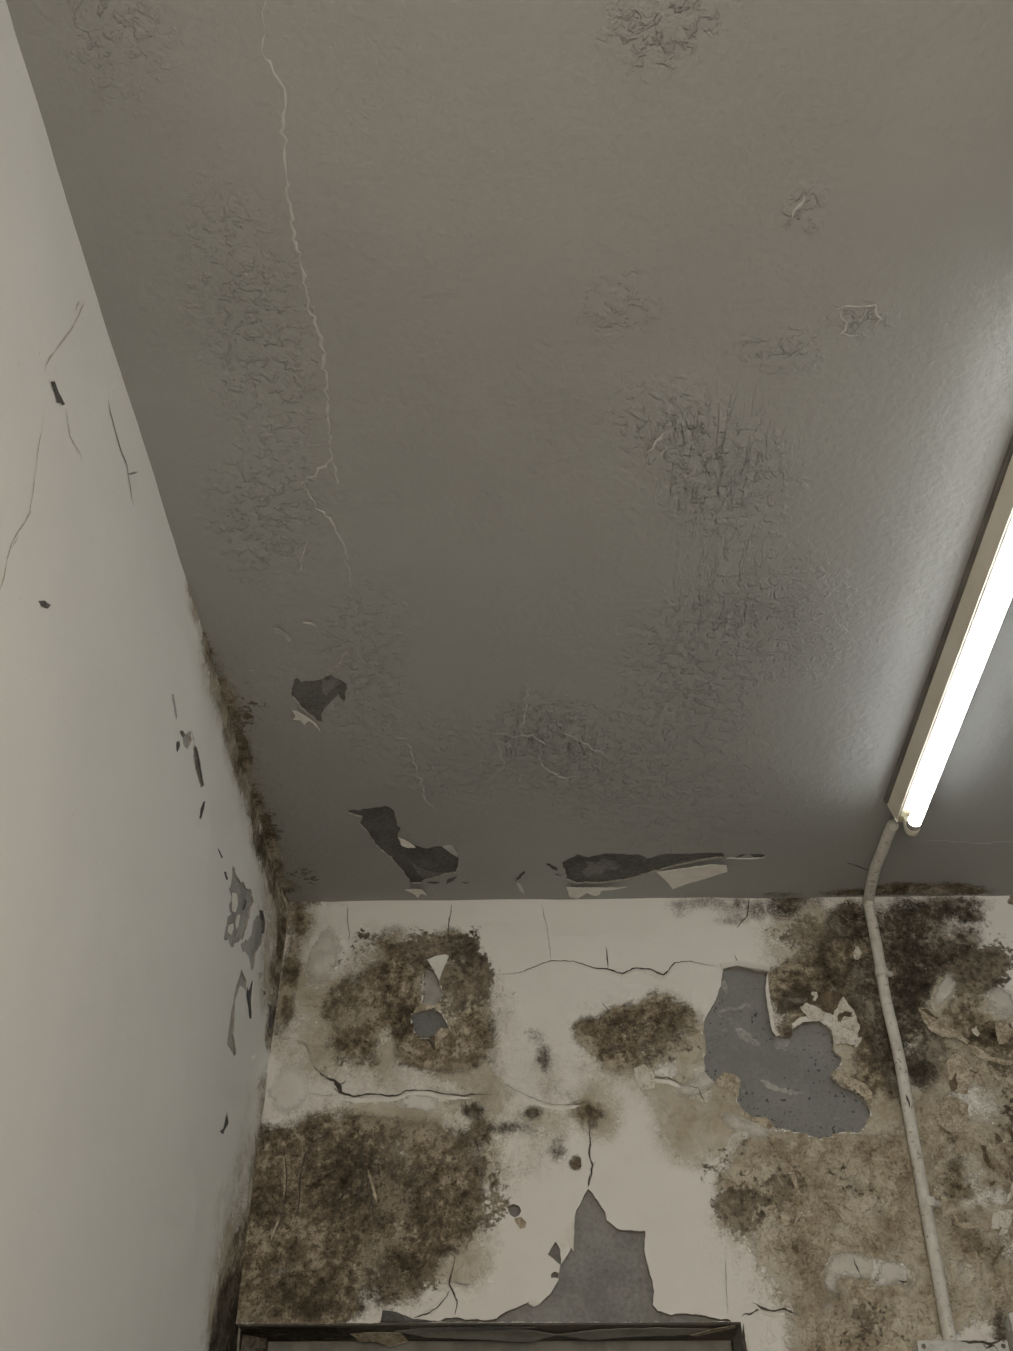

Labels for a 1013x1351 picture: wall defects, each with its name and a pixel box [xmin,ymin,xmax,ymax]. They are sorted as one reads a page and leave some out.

crack [45,300,85,371]
crack [0,409,83,589]
crack [108,401,136,505]
peeling [291,646,350,731]
spalling [218,849,273,1054]
peeling [348,806,469,898]
damp [187,585,1013,1351]
crack [512,871,749,1013]
peeling [546,853,765,899]
crack [302,1042,596,1182]
spalling [679,961,873,1139]
spalling [443,1176,736,1340]